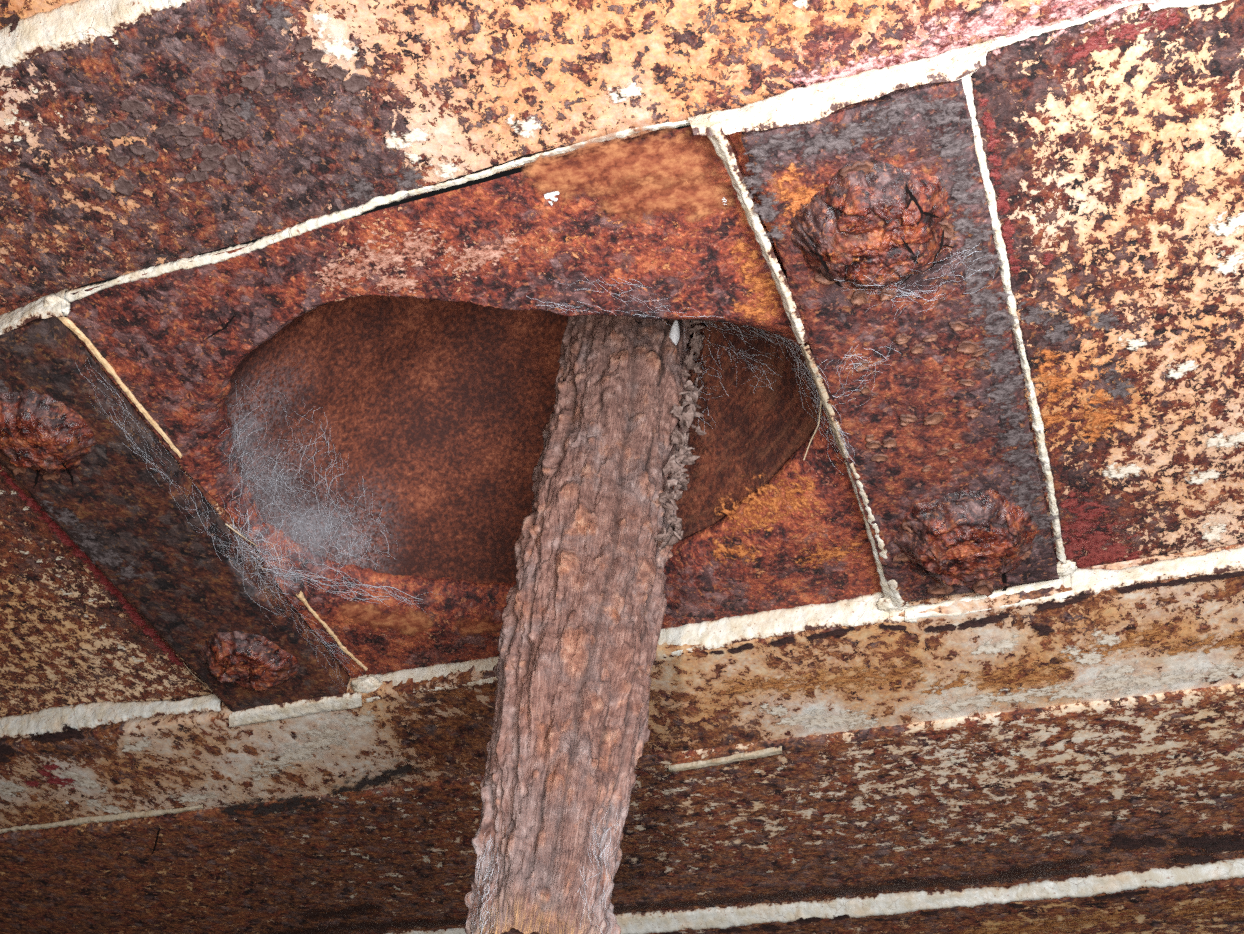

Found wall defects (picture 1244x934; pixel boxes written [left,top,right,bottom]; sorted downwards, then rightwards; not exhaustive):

rust [295,35,371,105]
rust [98,50,292,200]
rust [524,121,734,221]
rust [772,163,823,230]
rust [314,222,522,293]
rust [729,240,782,321]
rust [942,321,991,387]
rust [654,320,714,550]
rust [1034,349,1117,442]
rust [712,471,820,563]
rust [796,536,863,568]
rust [972,580,993,597]